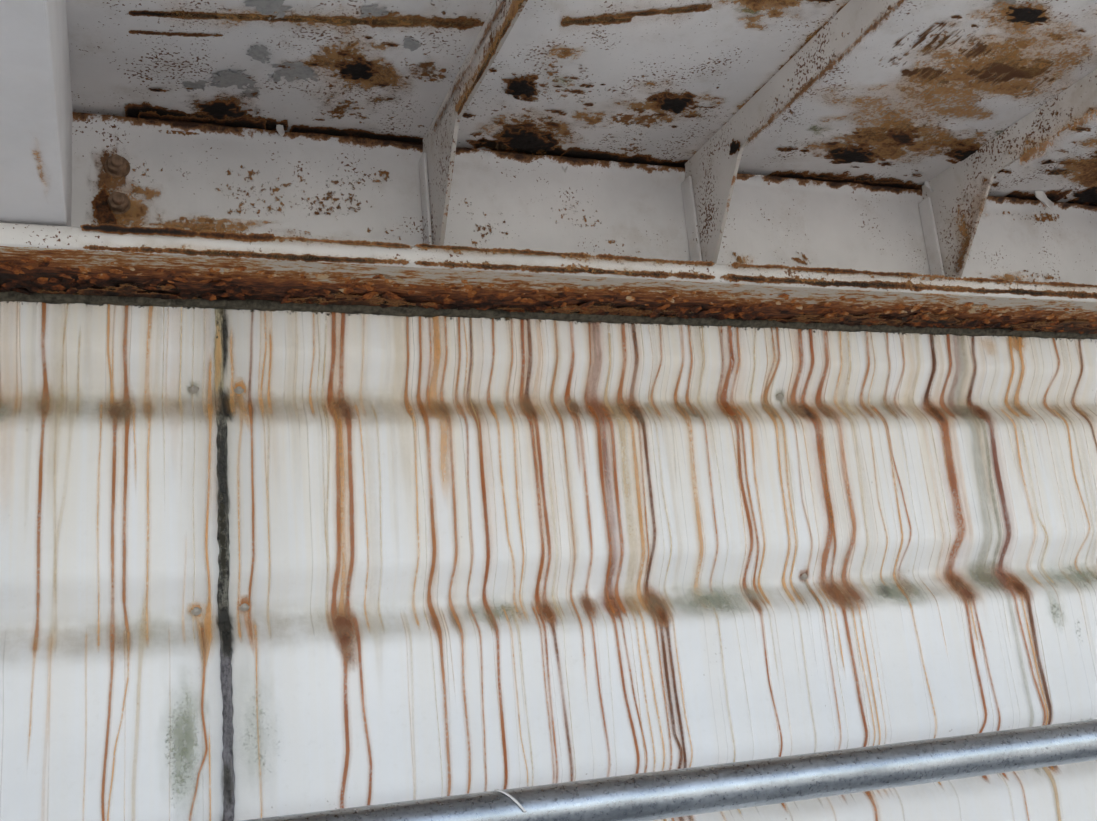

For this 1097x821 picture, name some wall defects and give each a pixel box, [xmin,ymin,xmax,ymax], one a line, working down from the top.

corrosion [303,0,721,155]
corrosion [719,0,1096,177]
corrosion [33,303,50,651]
corrosion [98,304,135,821]
corrosion [189,363,217,821]
corrosion [230,335,271,680]
corrosion [309,312,372,809]
corrosion [404,316,573,796]
corrosion [674,325,718,566]
corrosion [718,326,769,608]
corrosion [763,327,882,757]
corrosion [924,334,1052,733]